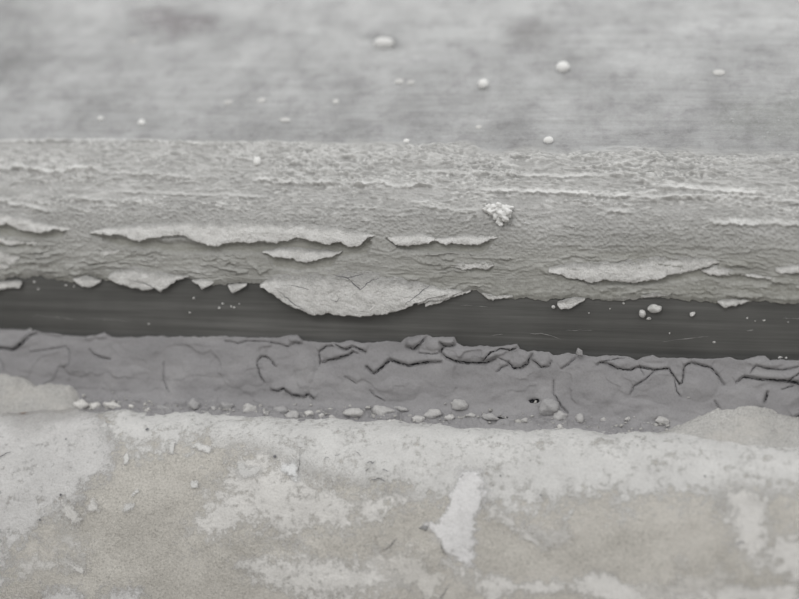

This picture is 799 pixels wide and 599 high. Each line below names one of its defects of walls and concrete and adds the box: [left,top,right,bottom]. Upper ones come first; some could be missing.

peeling [0,213,71,270]
peeling [388,233,497,247]
peeling [0,280,22,290]
peeling [73,220,471,317]
peeling [557,297,585,310]
peeling [549,256,799,283]
peeling [717,299,749,308]
crack [0,333,70,369]
crack [236,340,314,399]
crack [318,339,575,410]
crack [598,358,799,402]
peeling [419,468,491,568]